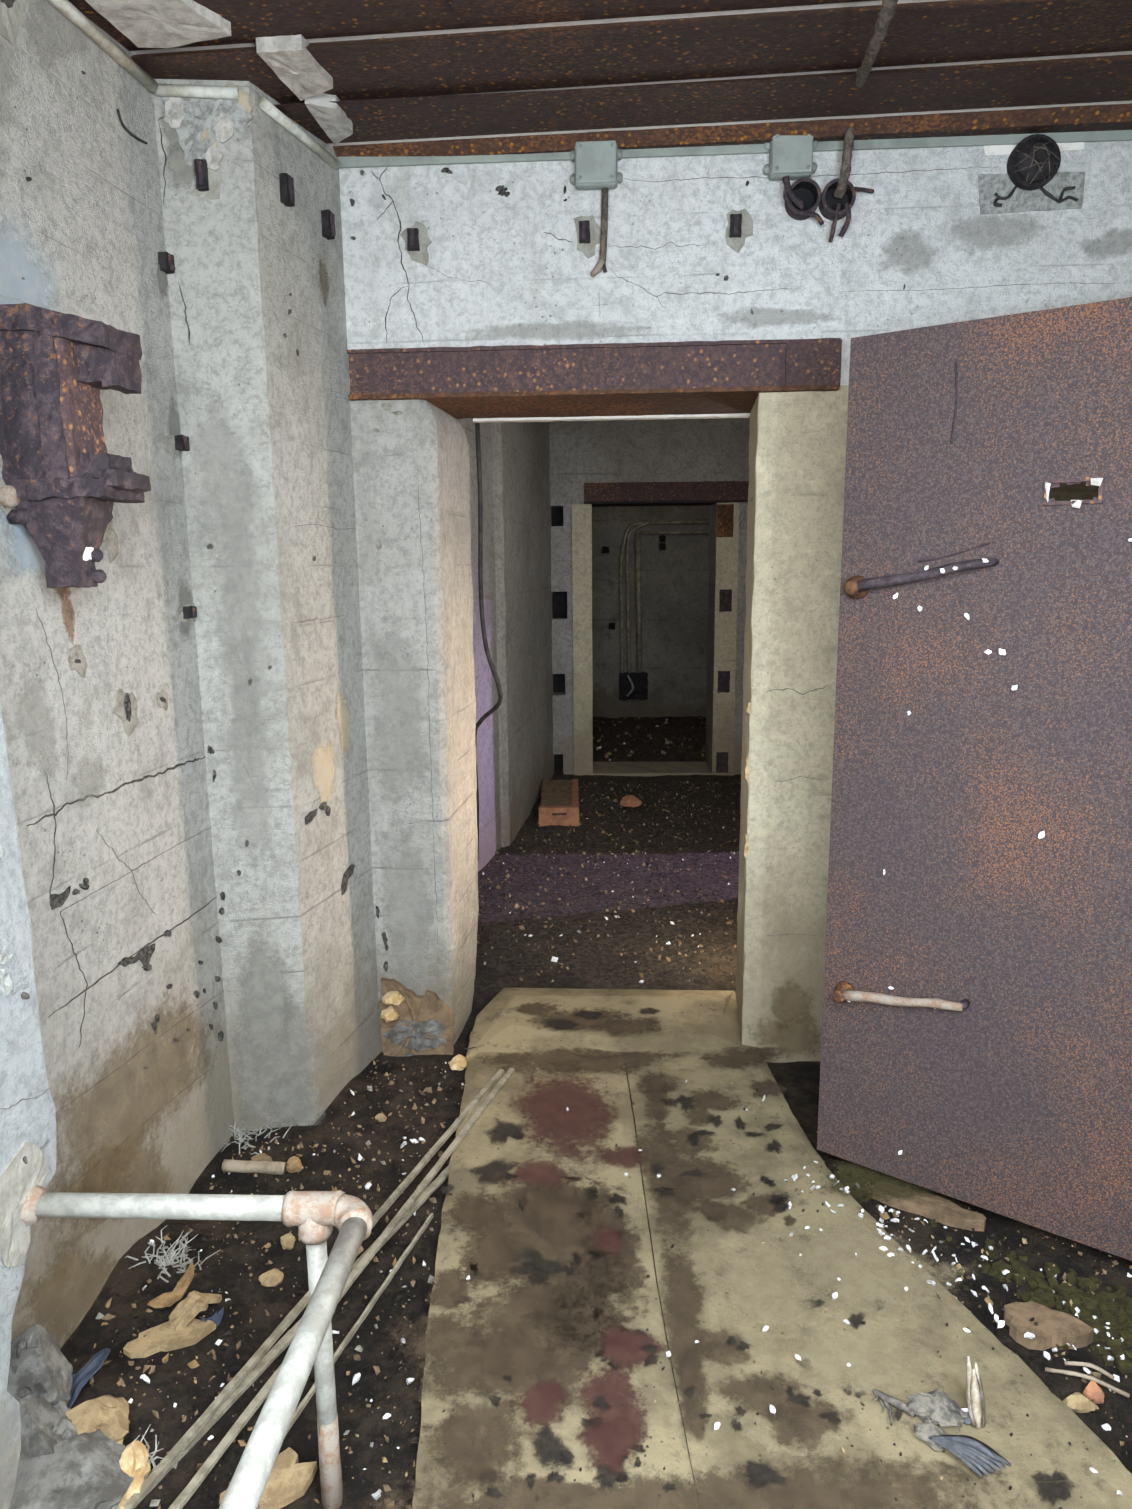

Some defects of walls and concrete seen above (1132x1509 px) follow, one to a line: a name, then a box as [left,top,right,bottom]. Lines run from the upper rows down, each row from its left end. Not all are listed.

crack [370,167,484,345]
crack [26,608,216,1047]
peeling [0,947,30,999]
crack [1,990,224,1111]
peeling [382,1019,447,1057]
water stain [375,1002,1003,1509]